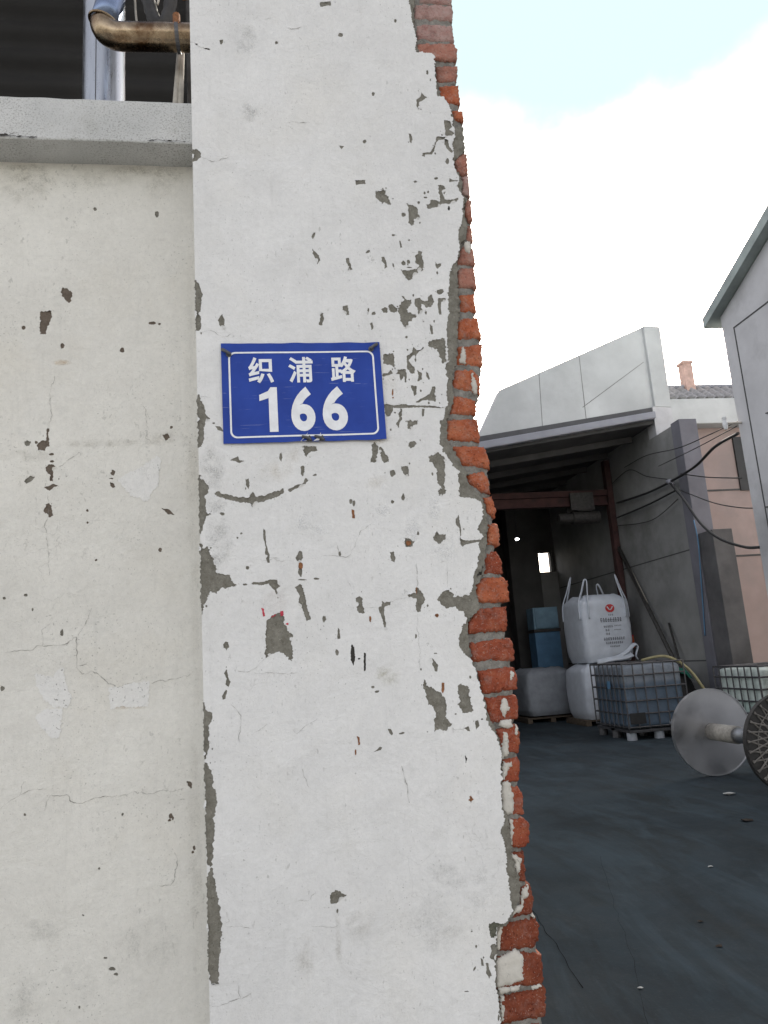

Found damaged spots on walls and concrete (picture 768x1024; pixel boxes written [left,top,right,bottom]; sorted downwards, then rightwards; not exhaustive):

peeling [198,446,317,615]
flaking render [367,0,546,1024]
crack [5,608,125,688]
peeling [264,613,293,661]
peeling [187,704,224,986]